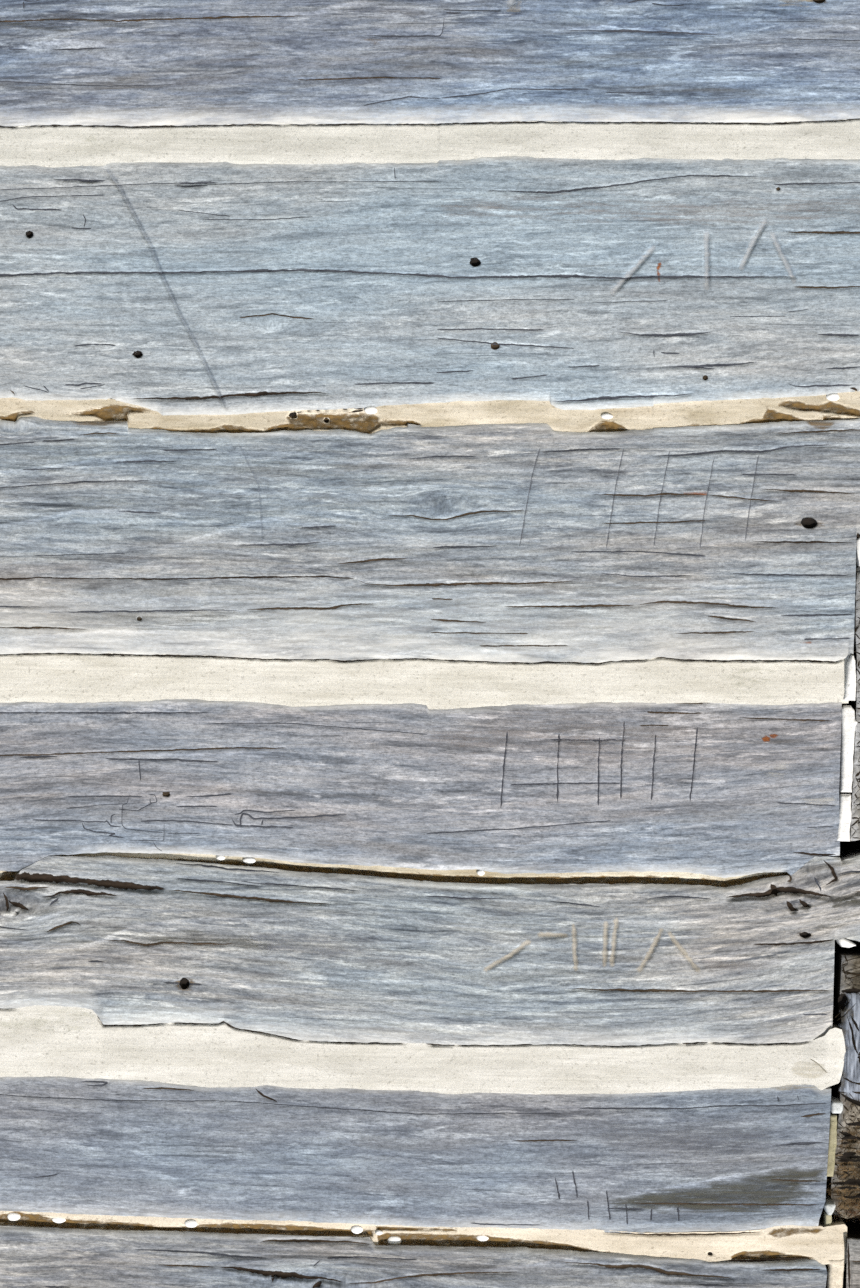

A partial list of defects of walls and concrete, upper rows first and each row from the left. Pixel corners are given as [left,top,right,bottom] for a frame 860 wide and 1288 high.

spalling [0,411,34,422]
spalling [73,405,148,421]
spalling [152,413,420,434]
spalling [589,421,627,432]
spalling [741,401,860,424]
spalling [731,1251,810,1260]